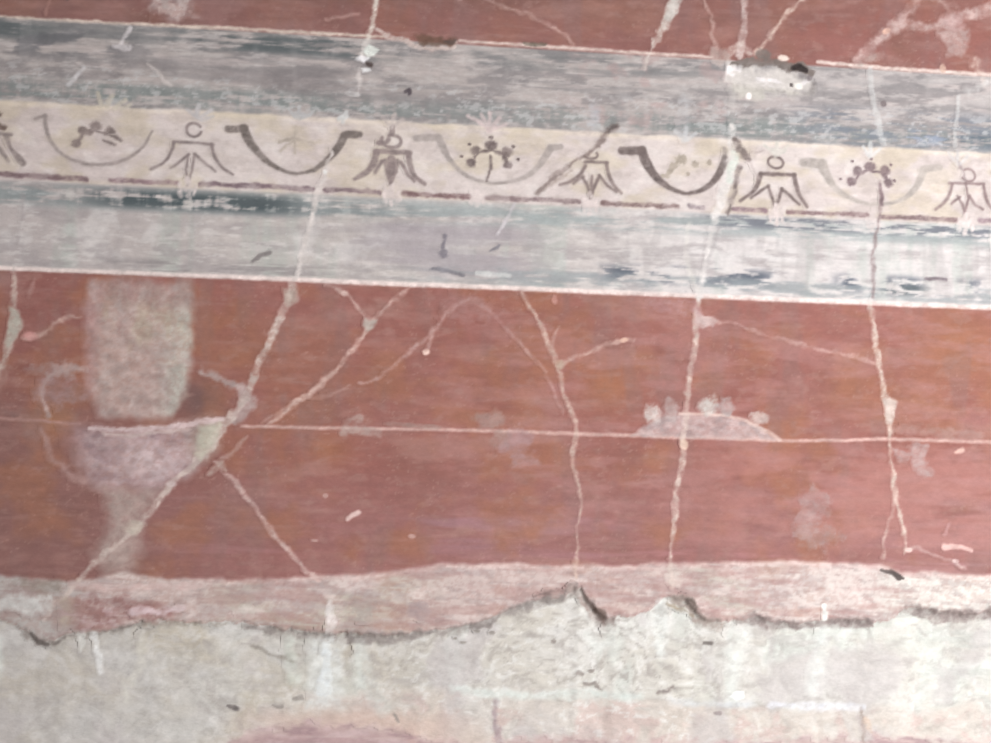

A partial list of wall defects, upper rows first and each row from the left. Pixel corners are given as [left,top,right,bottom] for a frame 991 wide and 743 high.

crack [344,0,381,98]
crack [454,0,576,47]
crack [533,121,621,197]
flaking render [717,47,818,106]
crack [0,191,84,394]
crack [20,147,637,663]
crack [641,0,991,634]
spalling [0,557,991,743]